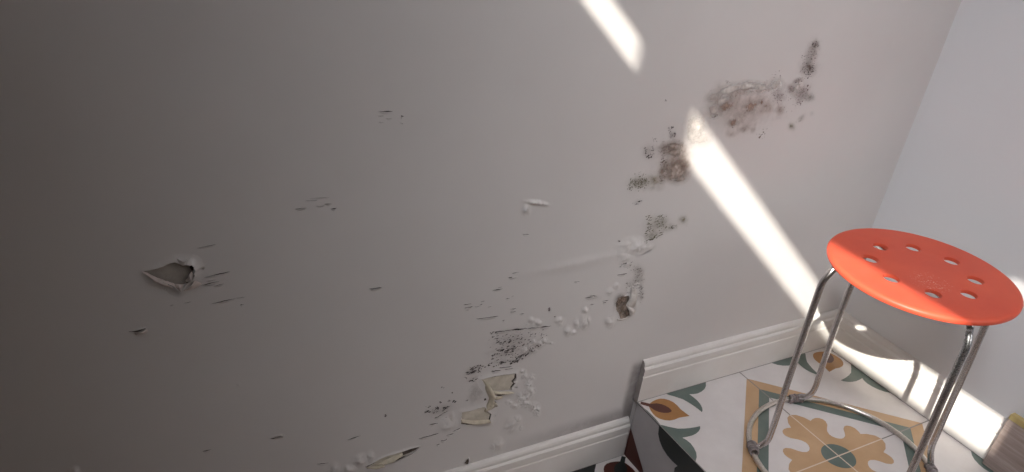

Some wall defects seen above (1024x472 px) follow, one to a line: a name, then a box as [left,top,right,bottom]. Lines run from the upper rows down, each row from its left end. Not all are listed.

damp [710,41,819,128]
damp [628,126,687,205]
peeling [137,253,205,298]
flaking render [612,273,643,321]
damp [465,329,547,382]
peeling [456,366,523,427]
peeling [365,445,422,469]